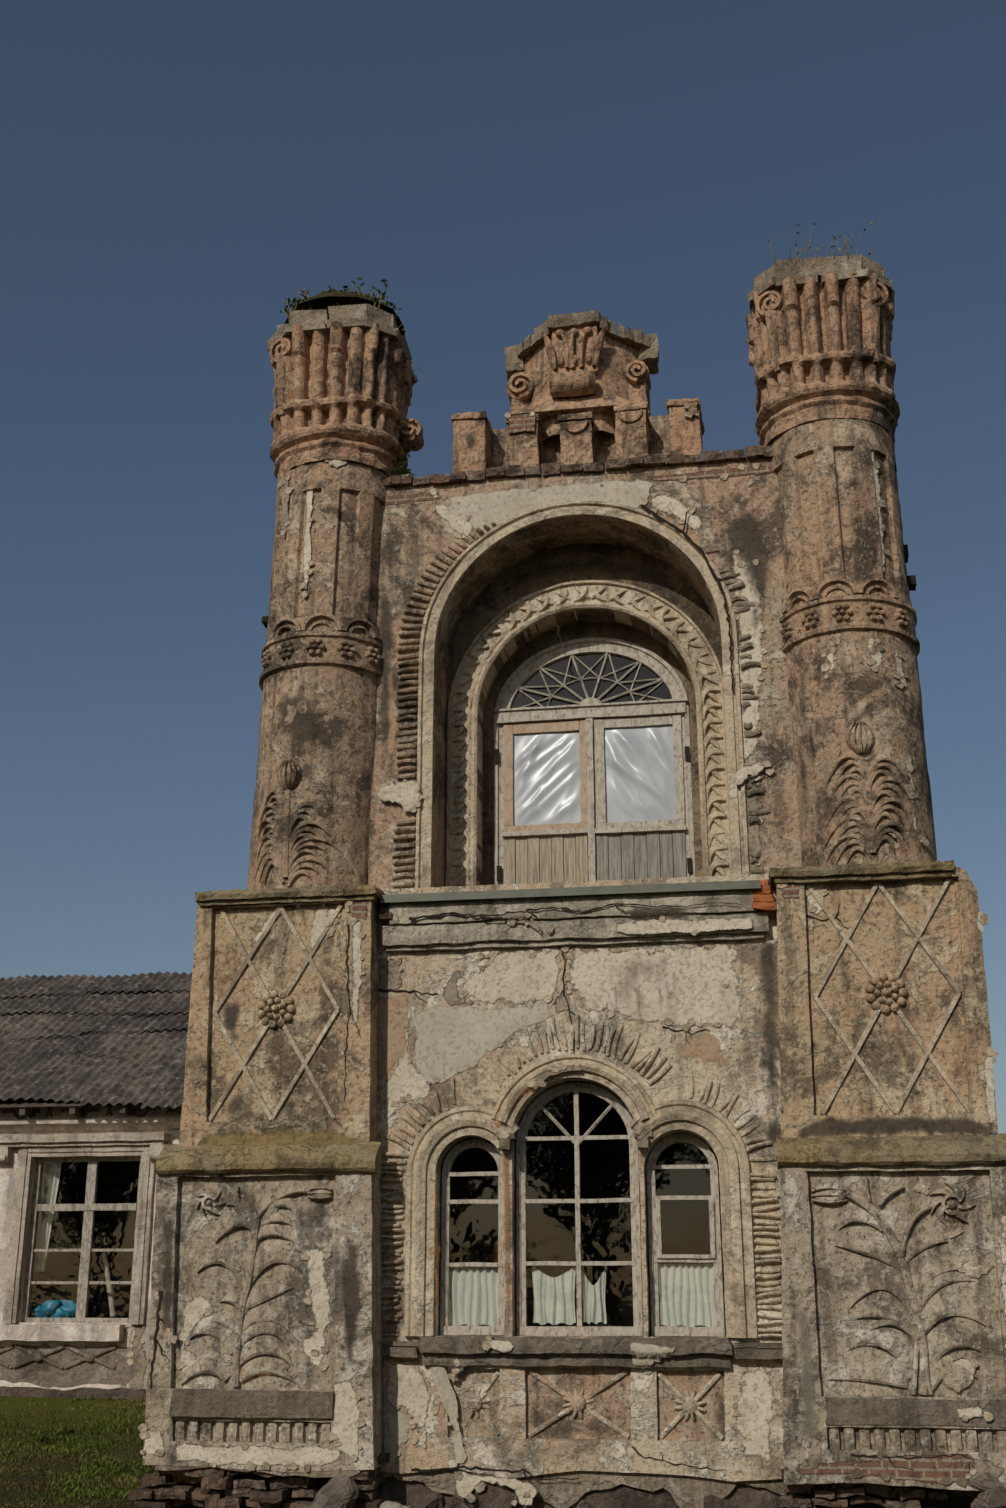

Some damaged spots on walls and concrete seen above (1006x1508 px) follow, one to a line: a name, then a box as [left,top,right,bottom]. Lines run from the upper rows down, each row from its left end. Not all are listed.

crack [409,902,740,921]
peeling [309,900,404,1024]
crack [550,951,575,1053]
peeling [380,912,753,1119]
peeling [116,1300,147,1389]
peeling [138,1244,366,1472]
peeling [384,1359,430,1456]
flaking render [447,1358,465,1380]
peeling [643,1353,662,1374]